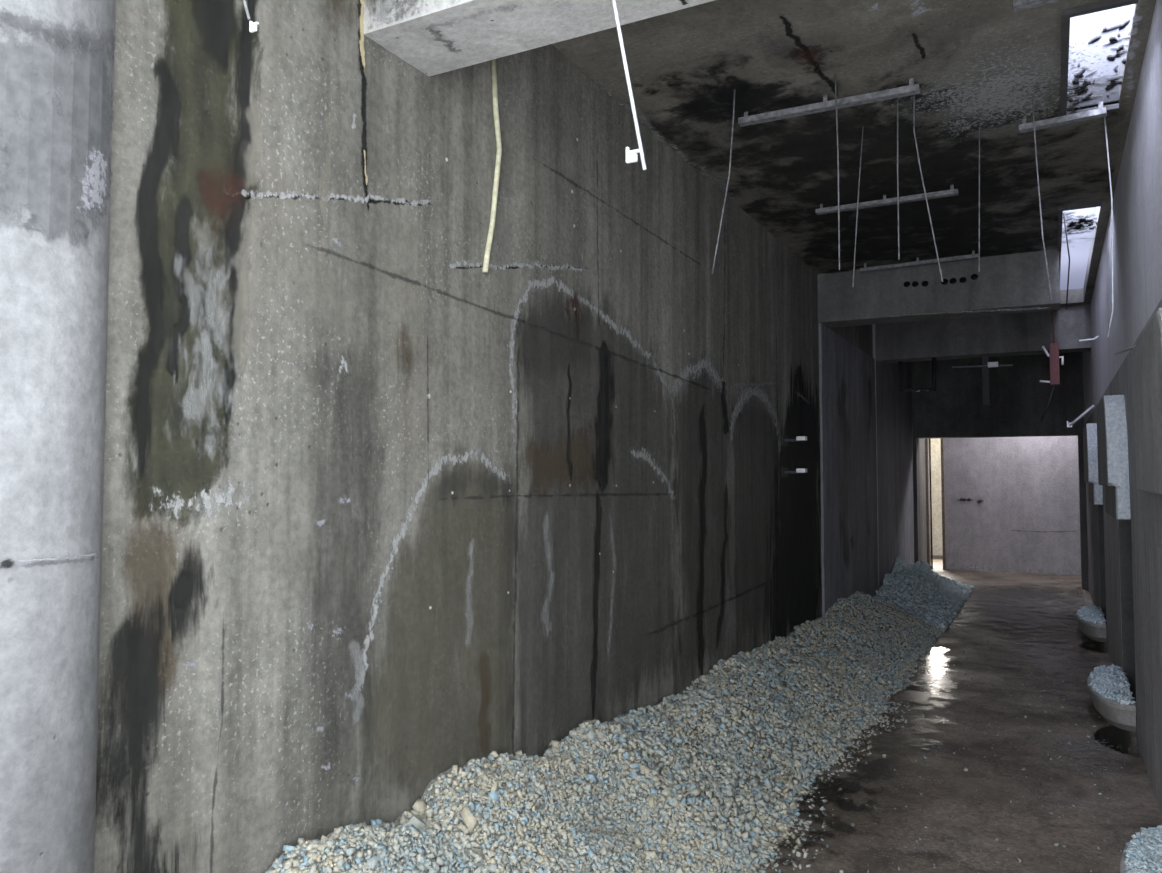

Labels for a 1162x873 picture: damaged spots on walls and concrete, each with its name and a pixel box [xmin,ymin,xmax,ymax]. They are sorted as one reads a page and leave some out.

leakage [0,12,115,244]
leakage [136,58,192,474]
leakage [219,0,257,426]
crack [199,0,432,218]
crack [780,16,837,93]
crack [912,33,925,59]
leakage [886,34,1109,140]
leakage [96,480,251,873]
leakage [350,448,513,788]
leakage [507,275,822,718]